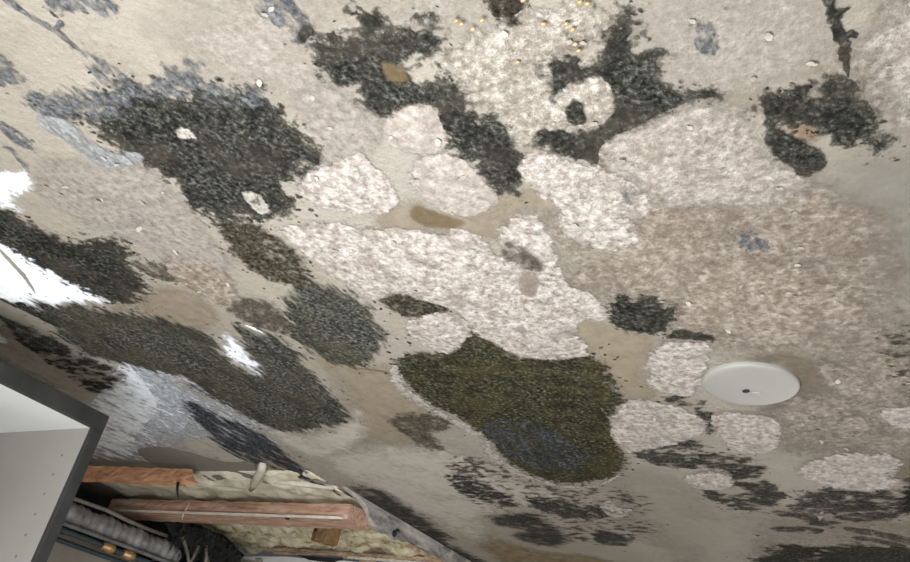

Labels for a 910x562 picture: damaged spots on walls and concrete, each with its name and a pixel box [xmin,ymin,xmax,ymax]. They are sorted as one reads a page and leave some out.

water stain [0,55,25,94]
water stain [259,0,910,238]
water stain [687,205,770,260]
peeling [223,336,262,376]
water stain [0,66,716,562]
spalling [533,186,910,456]
water stain [760,354,881,410]
water stain [875,325,910,405]
water stain [634,440,793,512]